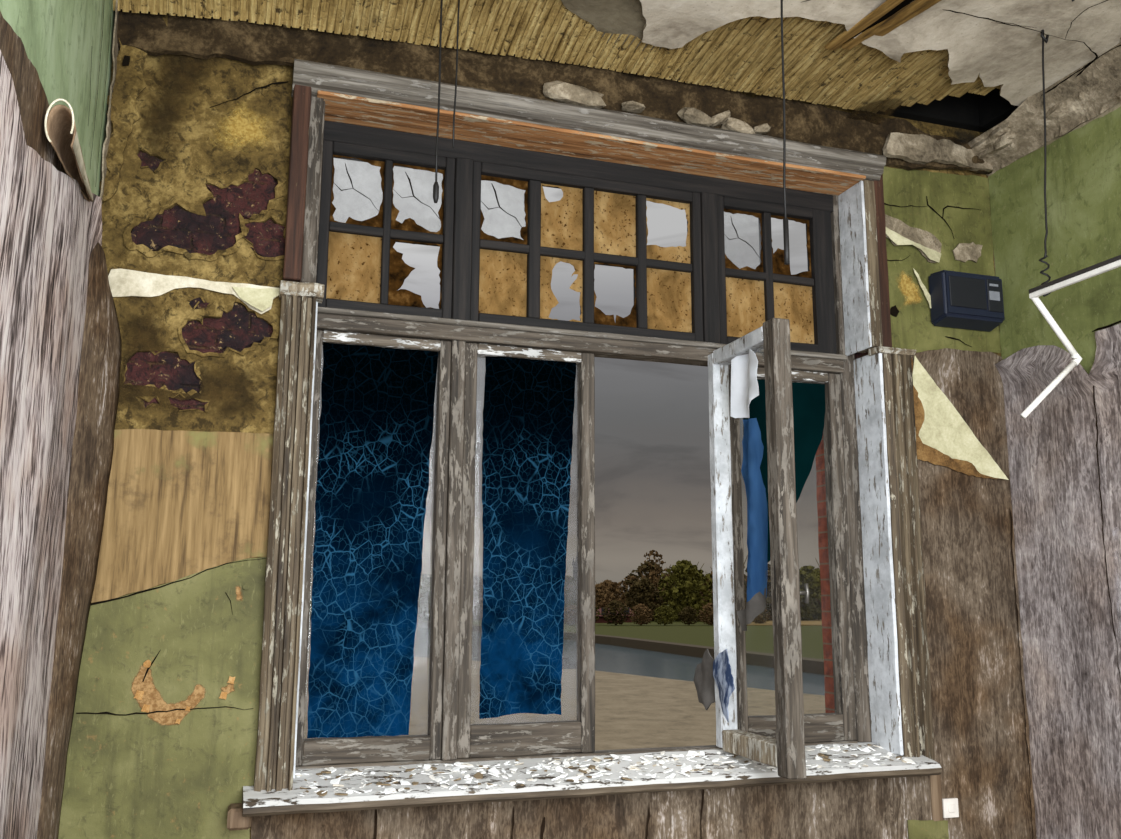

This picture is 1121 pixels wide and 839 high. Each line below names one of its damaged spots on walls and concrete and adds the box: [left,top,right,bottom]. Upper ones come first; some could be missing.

flaking render [123,160,287,262]
flaking render [122,296,280,412]
crack [76,706,253,716]
peeling [131,660,205,725]
peeling [219,676,235,699]